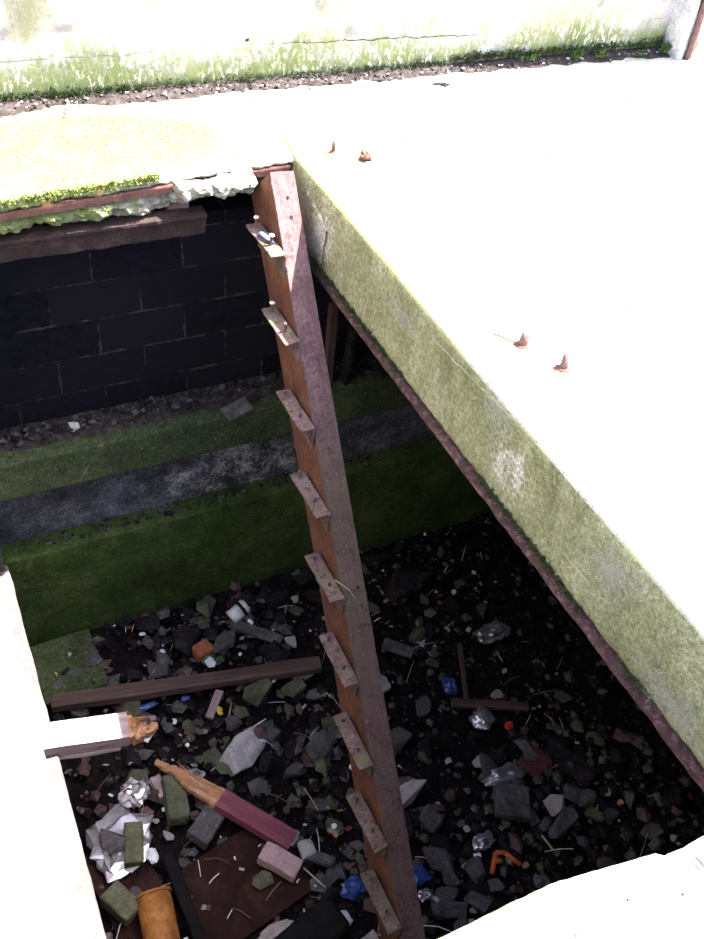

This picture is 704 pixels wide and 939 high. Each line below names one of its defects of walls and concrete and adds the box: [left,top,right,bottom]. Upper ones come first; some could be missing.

crack [264,34,479,56]
spalling [0,168,258,235]